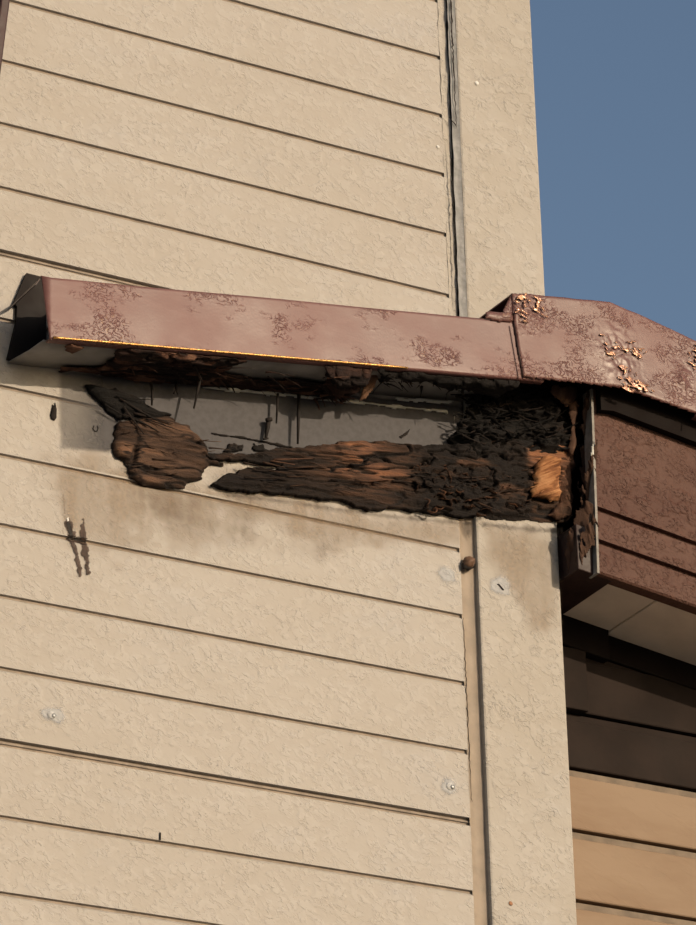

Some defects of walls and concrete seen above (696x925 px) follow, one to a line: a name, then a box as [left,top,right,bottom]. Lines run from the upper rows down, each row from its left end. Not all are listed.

peeling [78,375,464,455]
peeling [564,391,599,573]